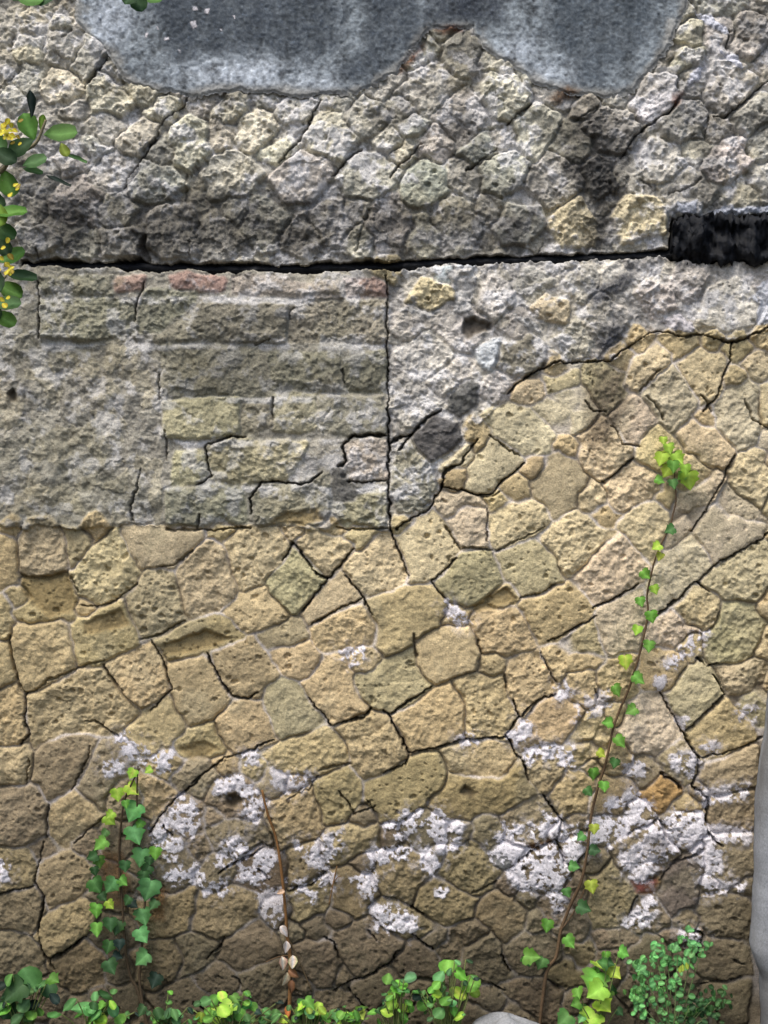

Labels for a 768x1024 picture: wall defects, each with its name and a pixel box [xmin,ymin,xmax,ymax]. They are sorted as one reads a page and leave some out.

peeling [675,200,698,217]
peeling [713,205,768,217]
efflorescence [102,731,176,778]
efflorescence [455,732,479,747]
efflorescence [504,719,576,769]
efflorescence [674,716,690,730]
efflorescence [736,704,759,725]
efflorescence [212,748,315,824]
efflorescence [486,740,752,929]
efflorescence [149,792,466,934]